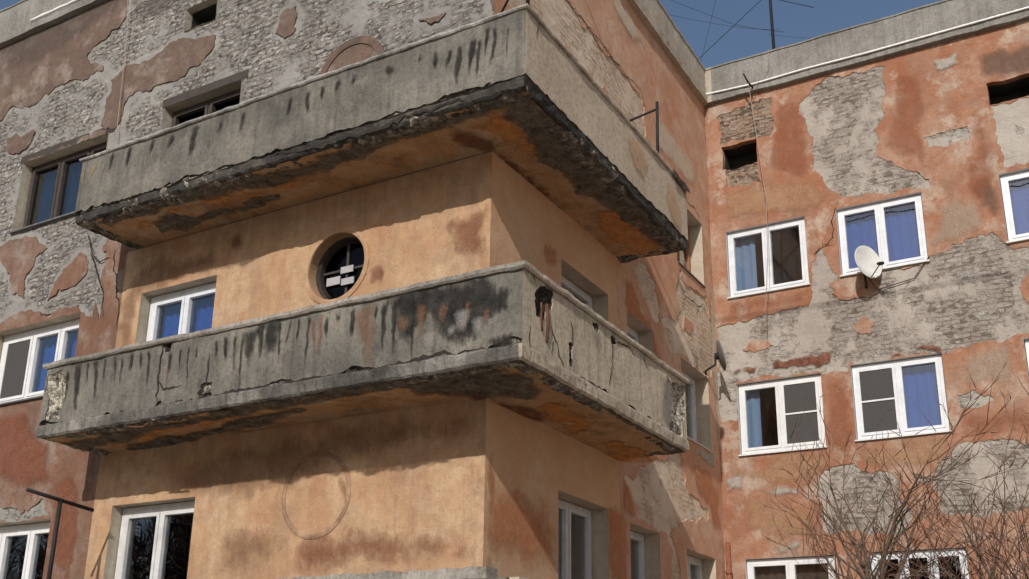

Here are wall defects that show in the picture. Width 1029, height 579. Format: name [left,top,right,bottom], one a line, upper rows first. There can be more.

damp [433,27,509,82]
crack [566,0,645,104]
flaking render [0,0,1029,425]
damp [215,318,310,387]
damp [324,309,354,333]
peeling [59,342,620,455]
damp [374,277,508,351]
crack [529,321,573,367]
crack [586,342,649,389]
flaking render [624,436,709,579]
flaking render [816,463,914,536]
flaking render [912,438,1029,517]